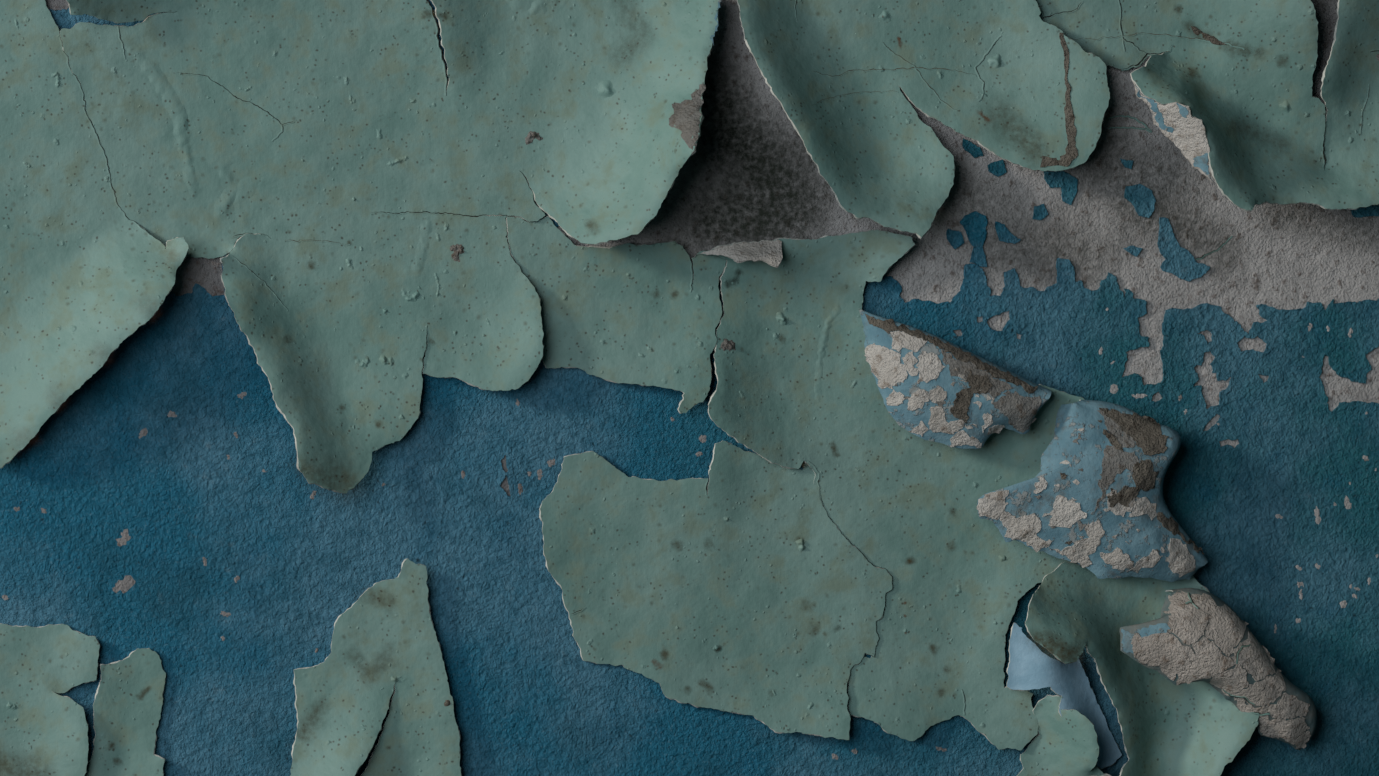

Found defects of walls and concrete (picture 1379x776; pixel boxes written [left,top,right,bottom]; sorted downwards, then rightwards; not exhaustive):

crack [59,37,166,249]
peeling [0,0,770,496]
crack [425,0,447,96]
crack [1041,0,1245,71]
peeling [539,0,1379,776]
peeling [0,623,166,776]
spalling [116,529,131,546]
spalling [112,575,136,593]
peeling [290,558,462,776]
crack [807,461,893,685]